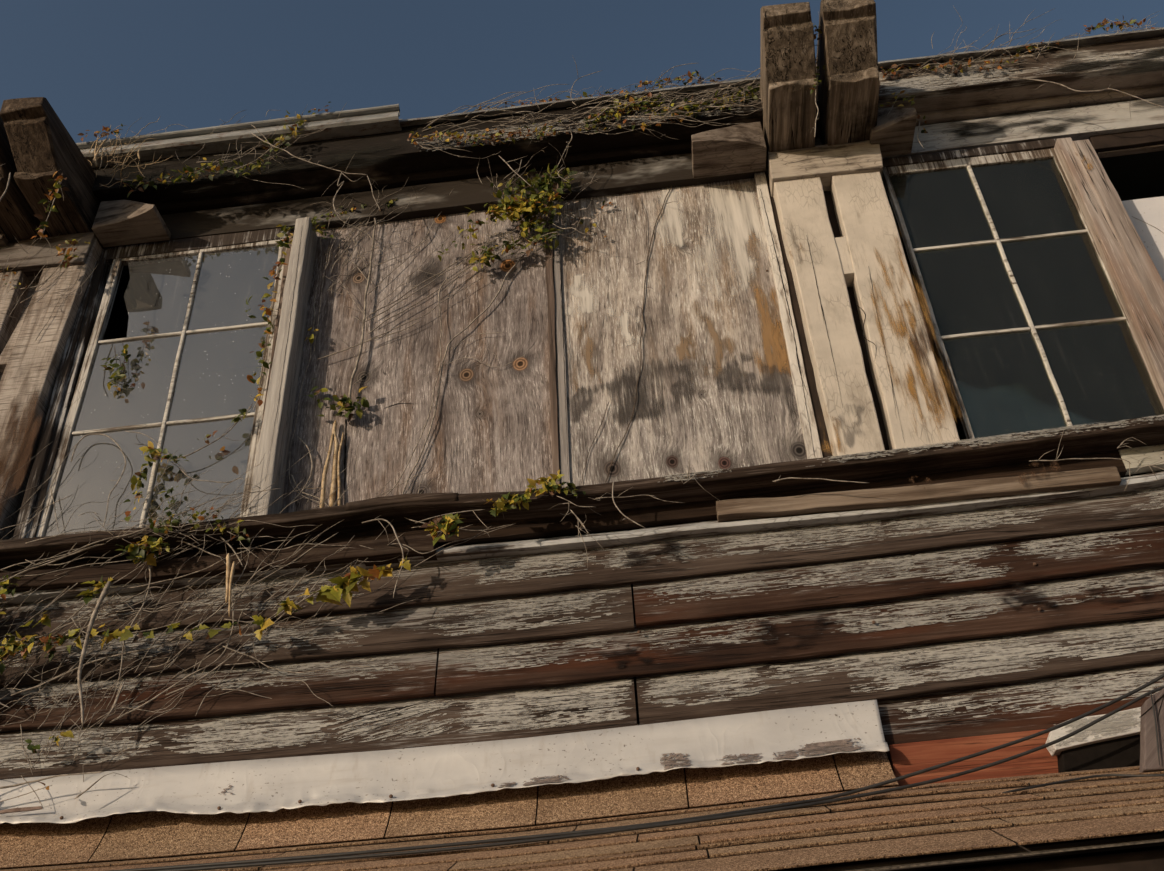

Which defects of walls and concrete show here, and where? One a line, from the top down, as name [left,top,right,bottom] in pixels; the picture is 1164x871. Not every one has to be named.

water stain [746,210,762,269]
water stain [566,274,695,426]
water stain [694,301,794,417]
peeling [1125,486,1164,510]
peeling [4,592,157,624]
peeling [180,575,427,690]
peeling [416,588,791,672]
peeling [457,504,1048,585]
peeling [638,530,1164,634]
peeling [0,618,1164,770]
peeling [497,775,569,788]